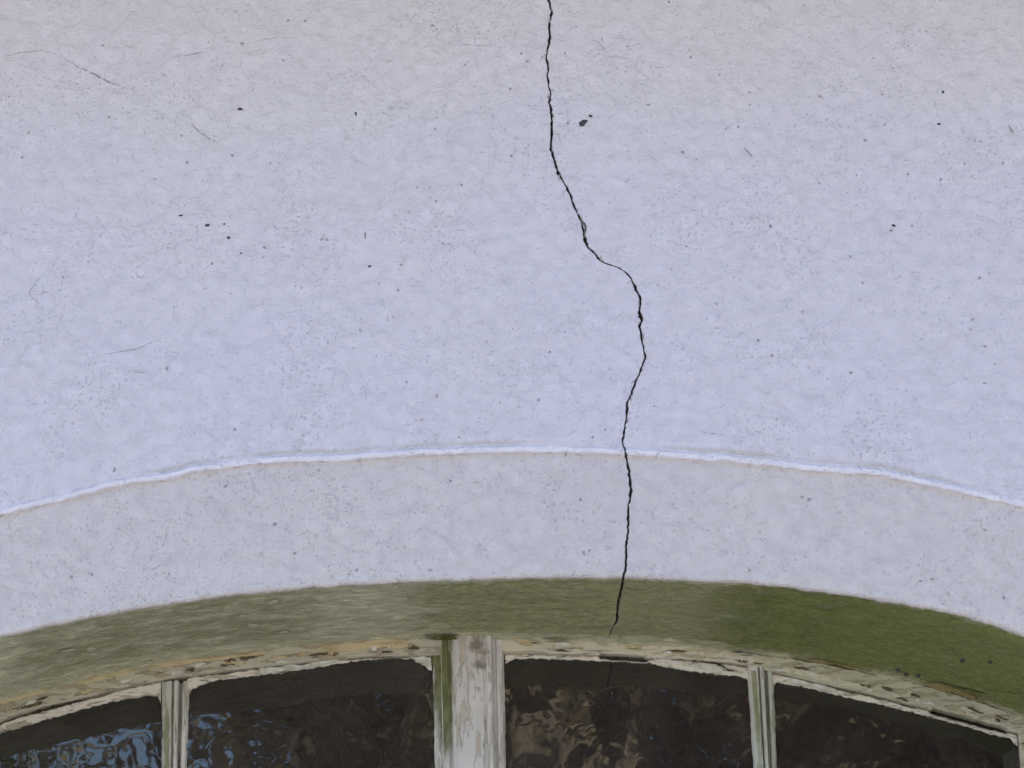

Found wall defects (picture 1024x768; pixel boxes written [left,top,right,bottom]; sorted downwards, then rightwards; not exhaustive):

crack [541,0,650,638]